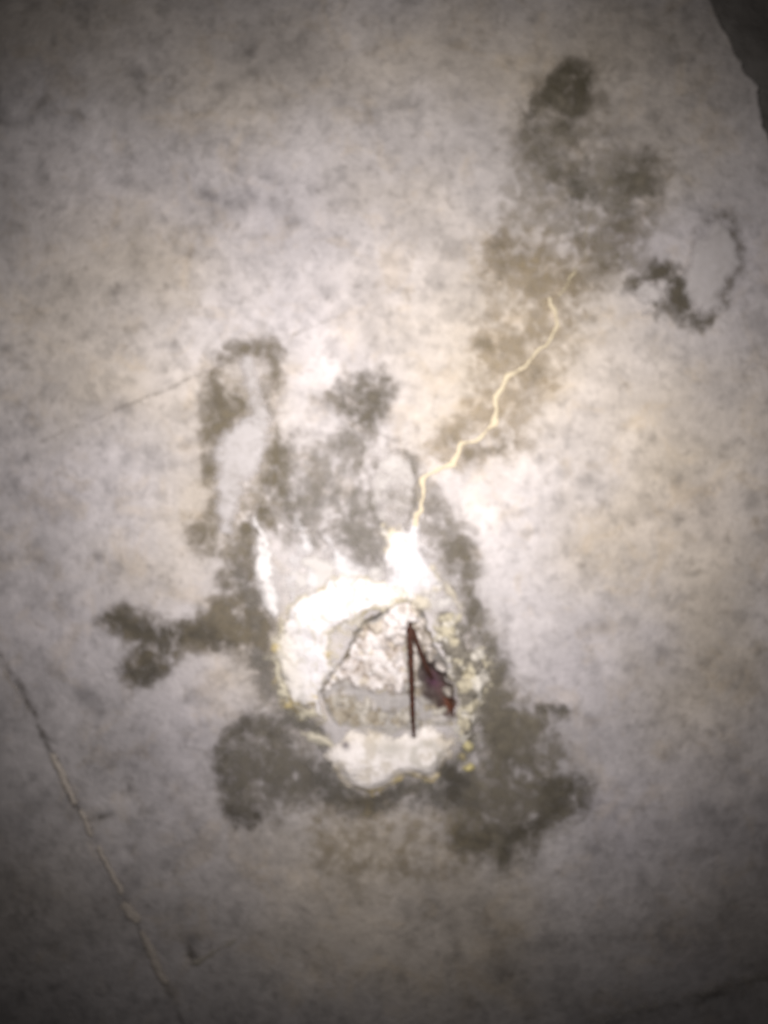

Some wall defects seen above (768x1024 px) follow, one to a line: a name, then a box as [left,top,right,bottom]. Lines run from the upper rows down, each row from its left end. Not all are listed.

damp [532,61,591,132]
damp [483,245,555,389]
damp [629,262,712,329]
damp [202,372,245,476]
damp [224,342,280,387]
damp [262,433,288,495]
damp [327,373,394,466]
crack [413,268,576,527]
damp [105,494,584,861]
spalling [320,600,457,735]
corrosion [420,657,457,715]